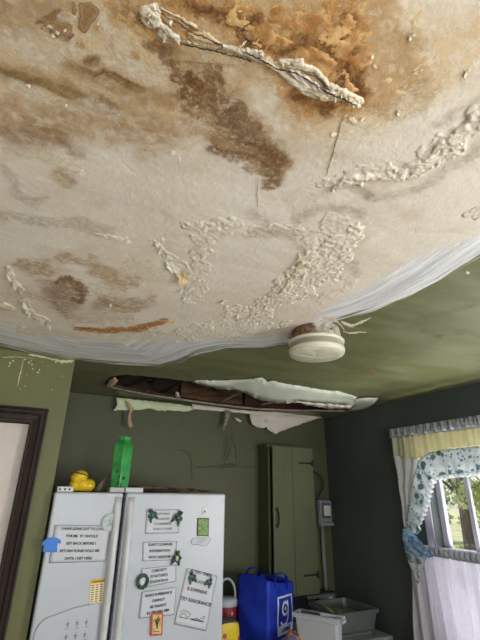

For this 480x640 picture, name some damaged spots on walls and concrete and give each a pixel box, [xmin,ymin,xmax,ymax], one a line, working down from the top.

peeling [0,265,54,337]
water stain [0,0,292,190]
flaking render [71,211,370,343]
crack [138,3,364,176]
water stain [290,0,480,137]
flaking render [315,104,480,193]
flaking render [461,205,480,221]